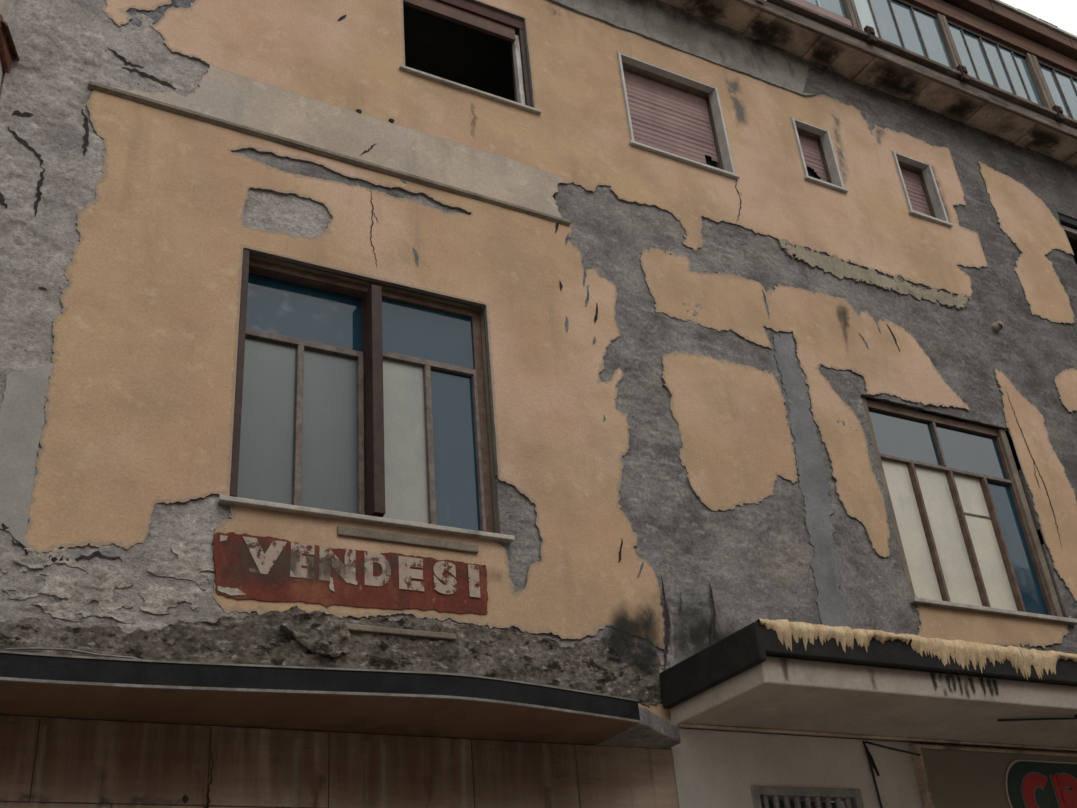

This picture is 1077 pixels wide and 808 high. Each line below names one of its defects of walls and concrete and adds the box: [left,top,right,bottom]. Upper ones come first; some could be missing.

damp [750,20,791,44]
damp [729,83,745,121]
damp [1030,128,1060,148]
spalling [243,189,332,237]
spalling [236,149,470,215]
crack [370,187,378,267]
spalling [0,0,258,633]
spalling [510,0,1077,672]
spalling [496,475,541,592]
damp [608,576,731,671]
damp [755,618,1077,696]
crack [204,772,212,808]